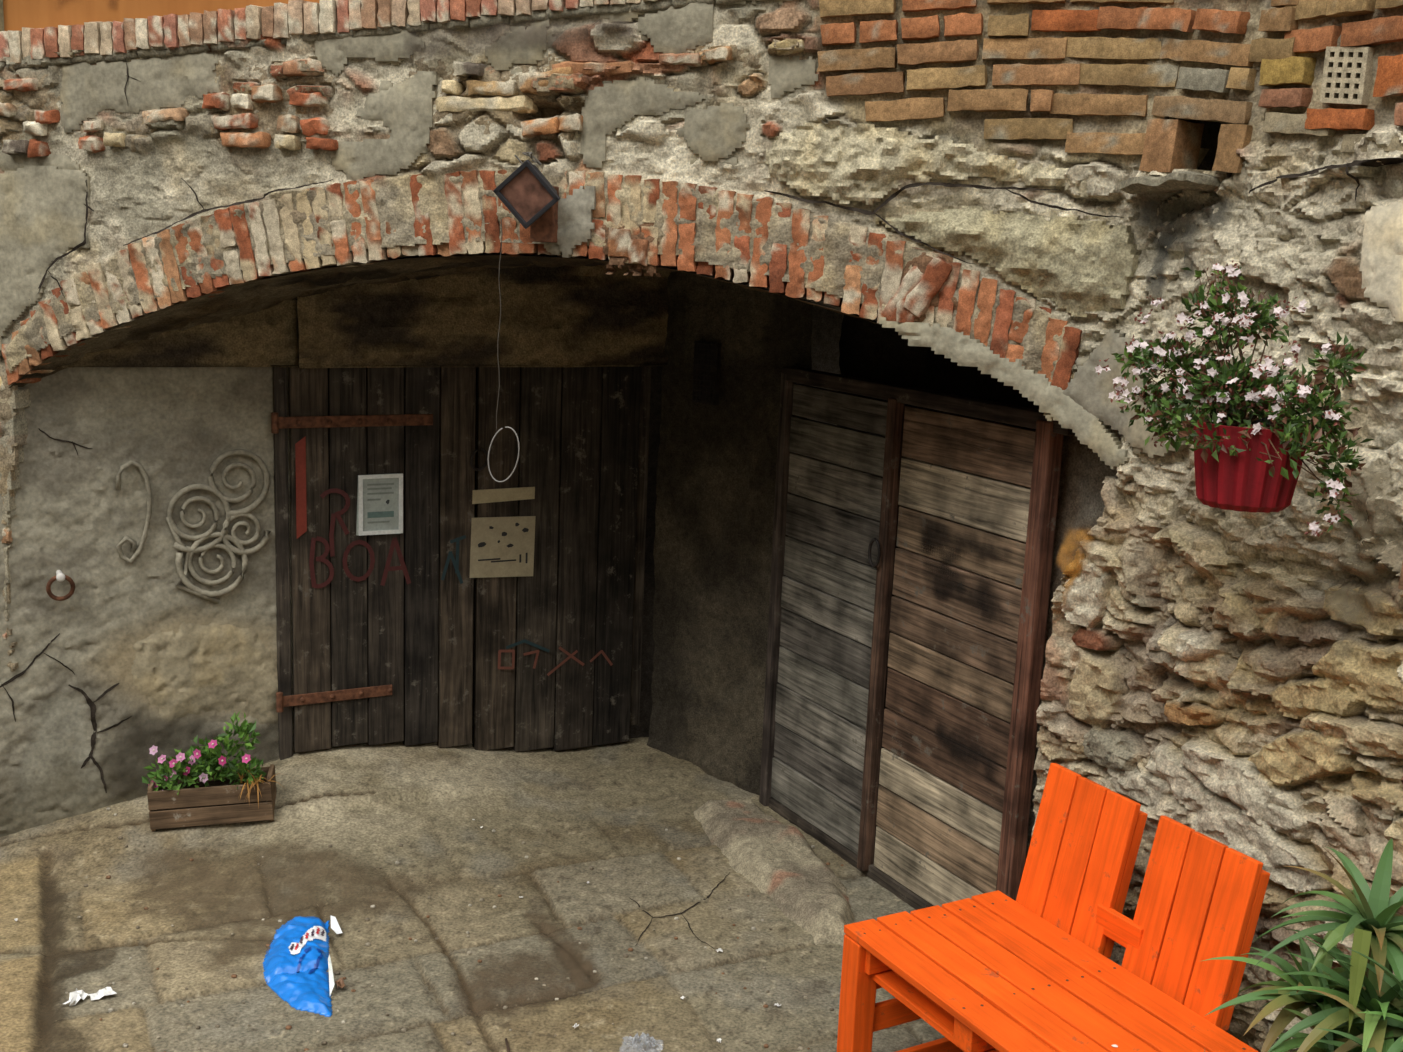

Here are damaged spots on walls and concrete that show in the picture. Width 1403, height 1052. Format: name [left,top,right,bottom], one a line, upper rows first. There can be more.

flaking render [637,2,819,98]
spalling [1197,121,1232,178]
flaking render [0,17,706,536]
flaking render [1359,202,1403,322]
crack [0,633,132,793]
crack [630,872,730,949]